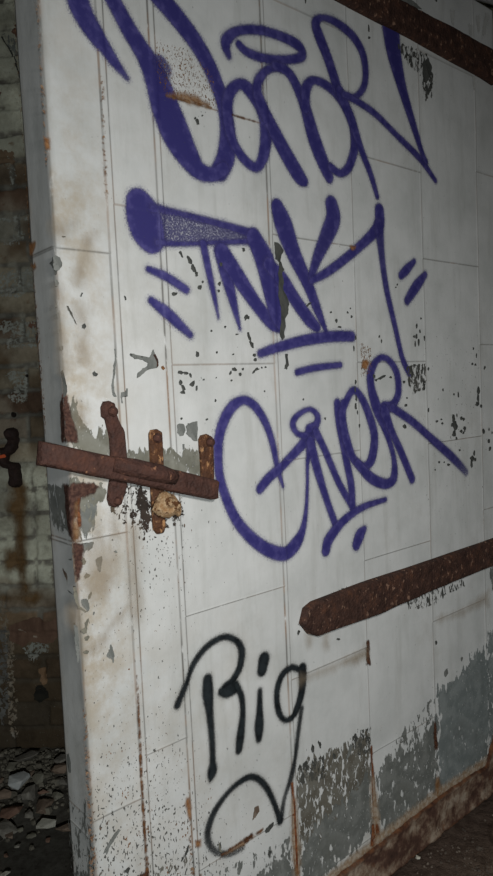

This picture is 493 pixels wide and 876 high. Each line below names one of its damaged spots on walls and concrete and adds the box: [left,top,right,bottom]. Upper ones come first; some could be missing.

rust [60,395,78,443]
rust [63,482,98,580]
peeling [407,581,464,609]
peeling [67,796,102,876]
rust [137,696,149,876]
rust [222,829,263,855]
rust [291,782,300,876]
peeling [212,630,493,876]
rust [328,746,487,876]